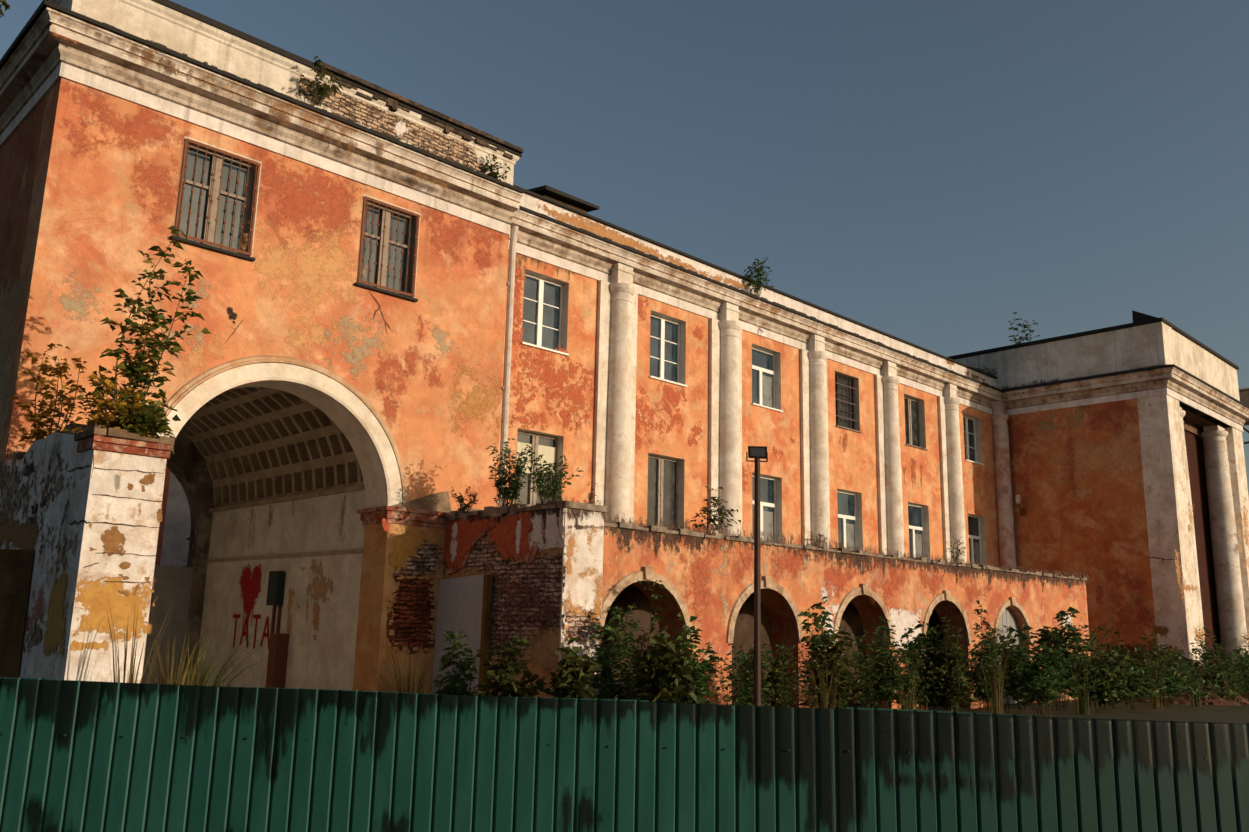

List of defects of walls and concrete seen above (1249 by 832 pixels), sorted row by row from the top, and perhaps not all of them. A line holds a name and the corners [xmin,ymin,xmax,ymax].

spalling [298,60,524,173]
peeling [60,271,103,321]
peeling [163,323,203,354]
peeling [184,280,210,308]
peeling [0,449,155,656]
spalling [387,498,603,670]